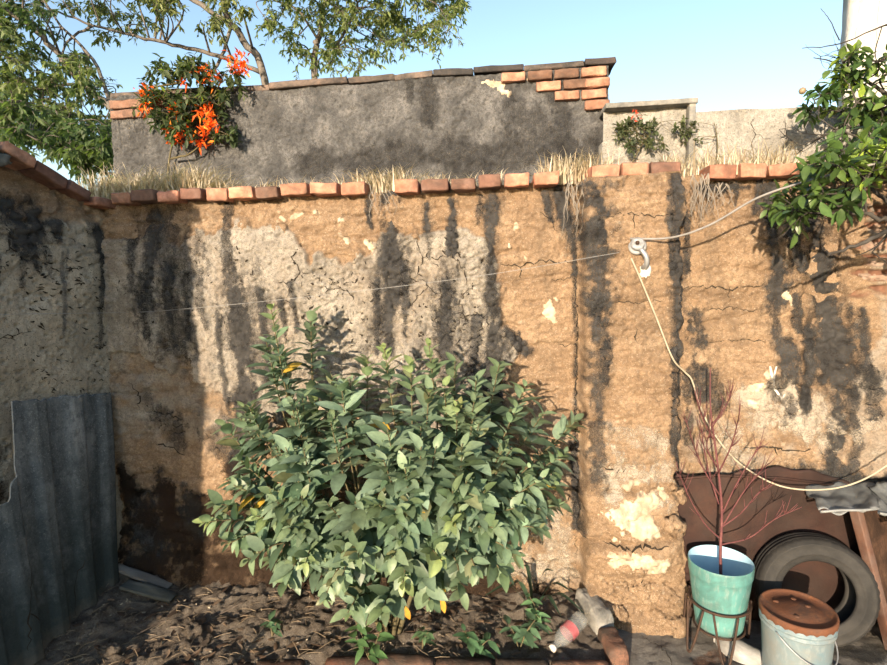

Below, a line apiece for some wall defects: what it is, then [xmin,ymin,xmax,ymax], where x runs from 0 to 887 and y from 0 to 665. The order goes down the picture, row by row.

water stain [297,77,601,179]
spalling [481,66,610,111]
crack [0,228,20,273]
water stain [0,191,69,335]
water stain [87,223,106,349]
flaking render [168,194,489,347]
water stain [357,191,412,363]
water stain [422,193,534,423]
spalling [858,222,887,281]
water stain [116,202,299,589]
water stain [445,172,887,599]
flaking render [598,477,671,578]